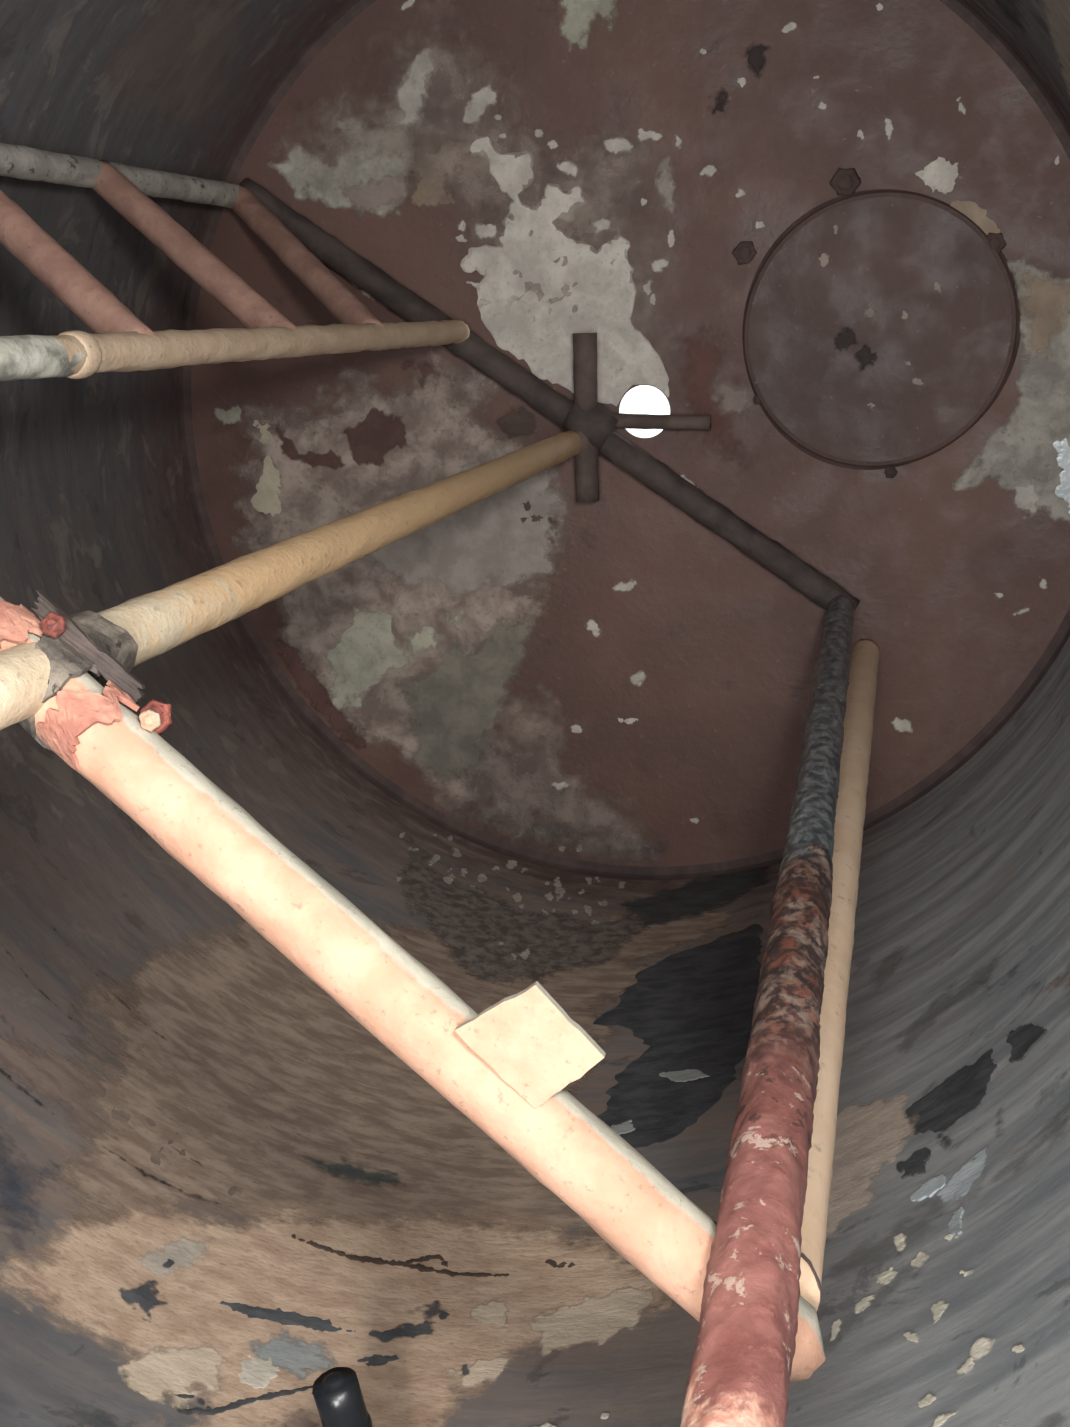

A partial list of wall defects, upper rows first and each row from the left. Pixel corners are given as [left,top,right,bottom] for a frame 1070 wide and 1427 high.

peeling [561,0,613,48]
peeling [274,47,682,406]
peeling [954,259,1070,521]
peeling [587,620,600,637]
peeling [613,581,637,591]
peeling [370,876,763,1148]
peeling [0,920,674,1427]
peeling [827,1023,1047,1236]
crack [291,1234,509,1277]
peeling [830,1232,928,1341]
peeling [918,1393,955,1427]
peeling [957,1337,992,1374]